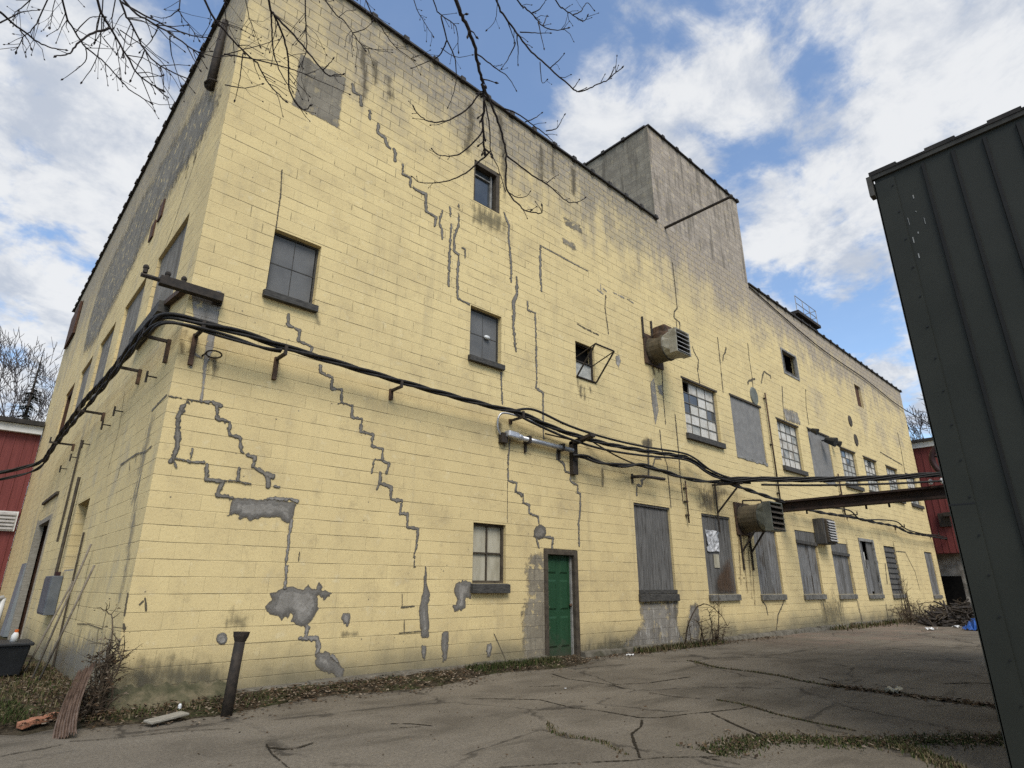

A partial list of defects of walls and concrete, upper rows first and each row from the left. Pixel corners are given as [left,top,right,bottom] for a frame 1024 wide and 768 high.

spalling [292,54,346,127]
crack [351,83,470,306]
crack [109,392,280,500]
crack [286,313,419,568]
crack [504,212,588,549]
spalling [227,496,344,677]
spalling [419,566,449,662]
spalling [453,580,471,611]